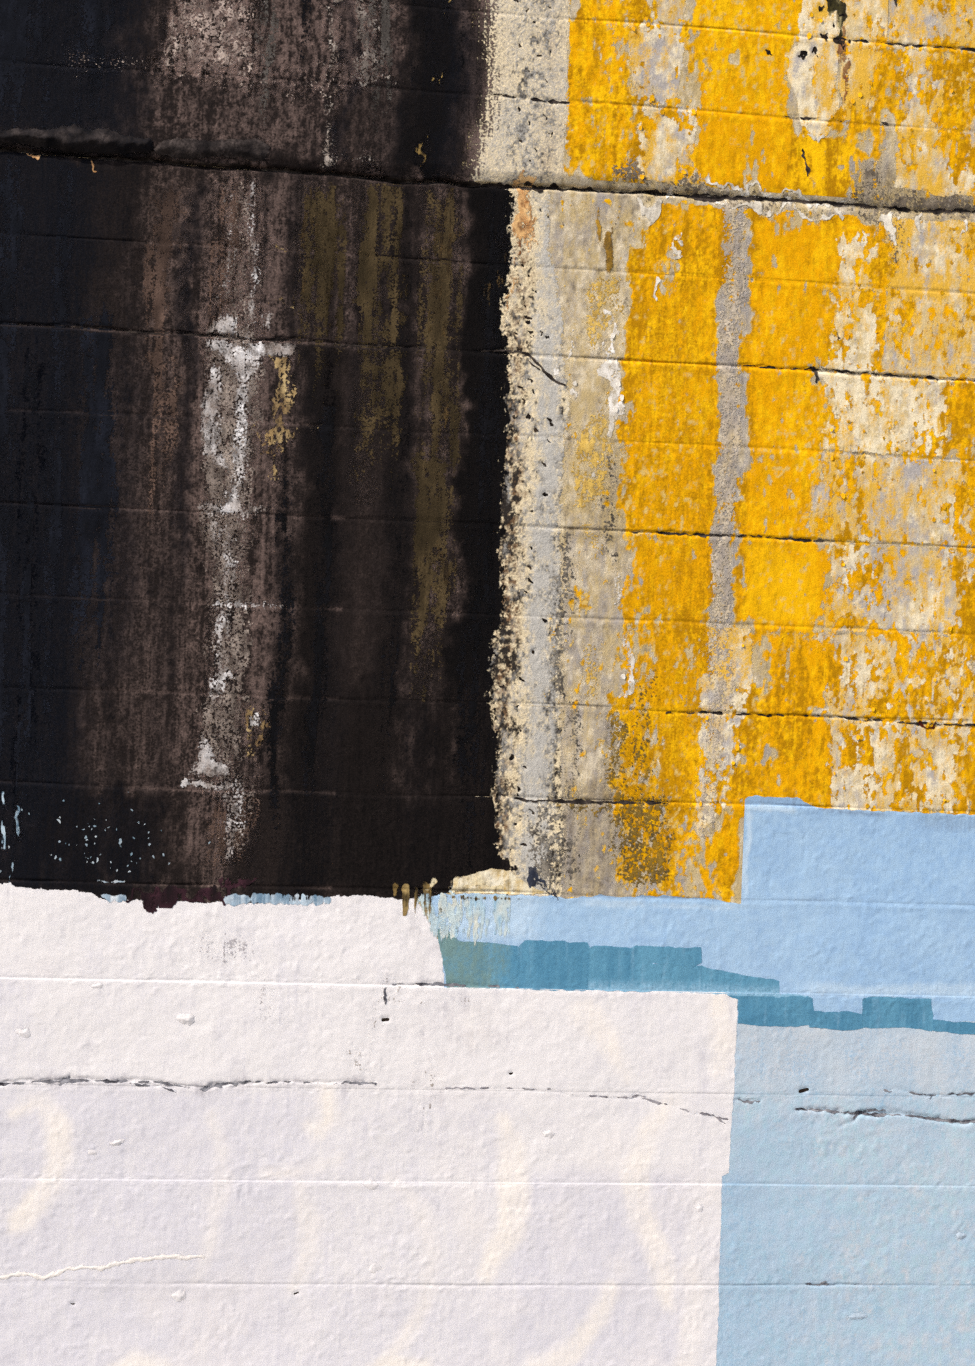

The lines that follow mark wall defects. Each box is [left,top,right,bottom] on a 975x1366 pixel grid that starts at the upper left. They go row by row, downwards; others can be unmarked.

crack [0,116,975,214]
peeling [628,0,703,186]
peeling [765,0,975,197]
water stain [0,0,675,945]
spalling [429,0,625,897]
peeling [809,217,975,814]
peeling [619,635,635,698]
peeling [694,627,753,835]
crack [0,1075,377,1093]
crack [445,1087,760,1124]
crack [795,1089,975,1124]